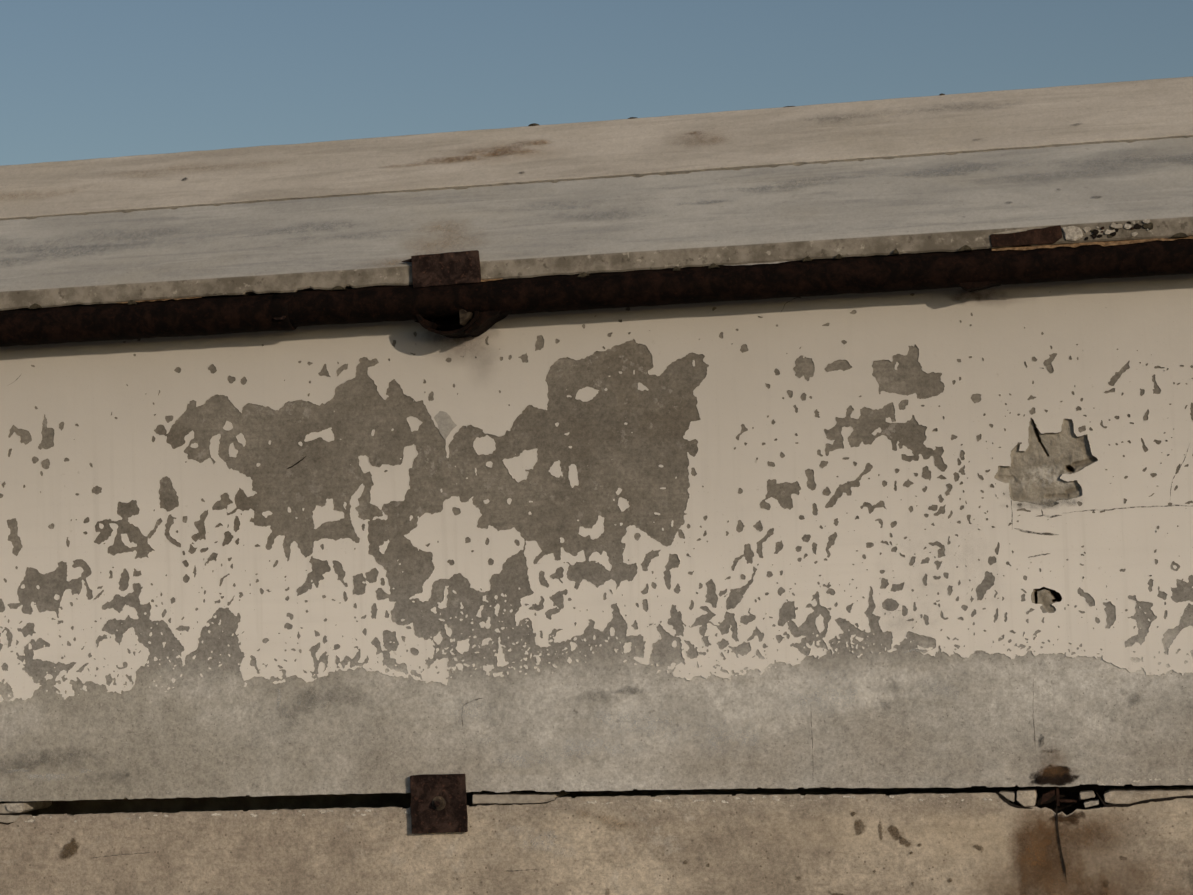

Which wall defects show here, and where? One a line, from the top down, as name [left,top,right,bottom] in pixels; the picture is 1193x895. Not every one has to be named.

peeling [1104,349,1193,396]
peeling [0,307,1149,701]
peeling [1108,432,1193,509]
peeling [1031,545,1193,671]
crack [471,795,557,805]
crack [996,791,1067,883]
rust [1031,765,1079,786]
crack [1096,792,1193,807]